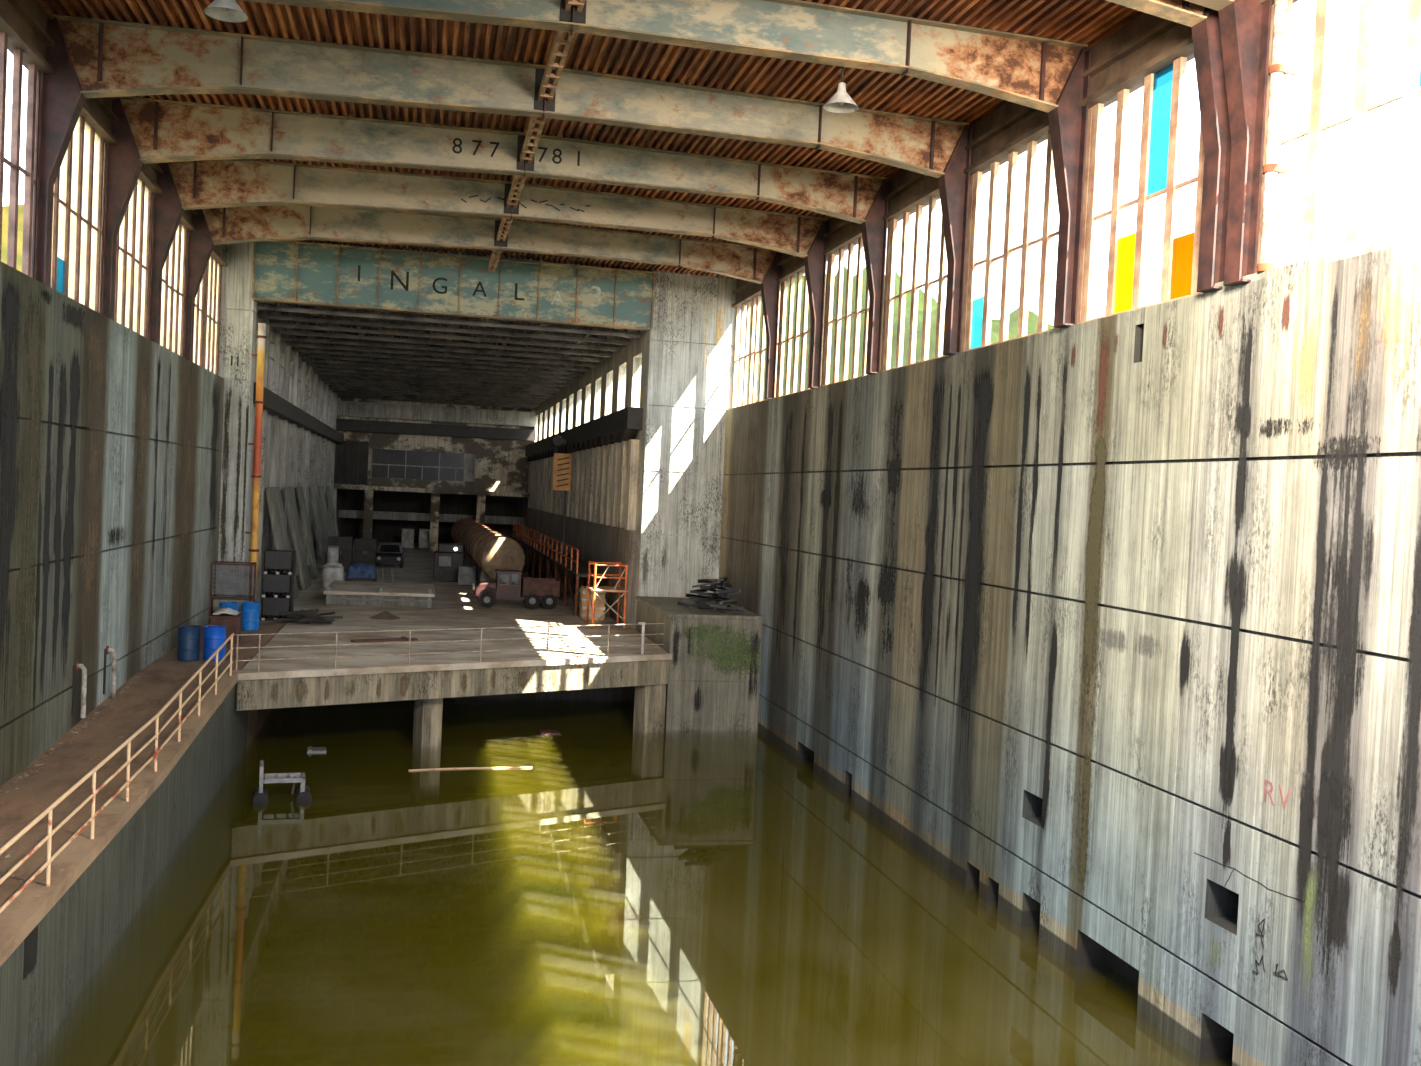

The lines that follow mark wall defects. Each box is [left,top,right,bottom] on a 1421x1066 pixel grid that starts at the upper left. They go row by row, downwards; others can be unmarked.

damp [0,283,249,708]
damp [919,370,994,747]
damp [1219,280,1380,976]
damp [1388,528,1421,994]